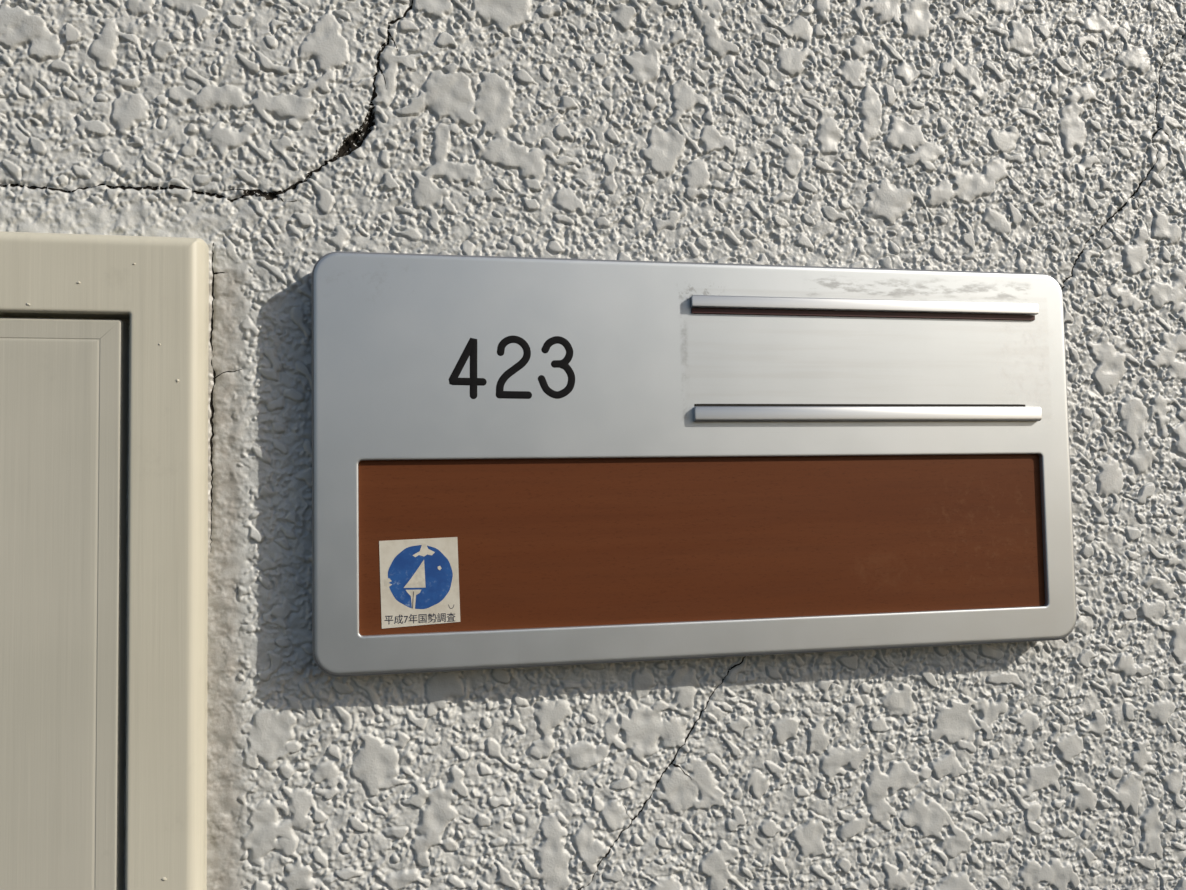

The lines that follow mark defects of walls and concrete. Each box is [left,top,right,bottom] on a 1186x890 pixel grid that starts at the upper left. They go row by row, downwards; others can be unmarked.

crack [0,0,413,202]